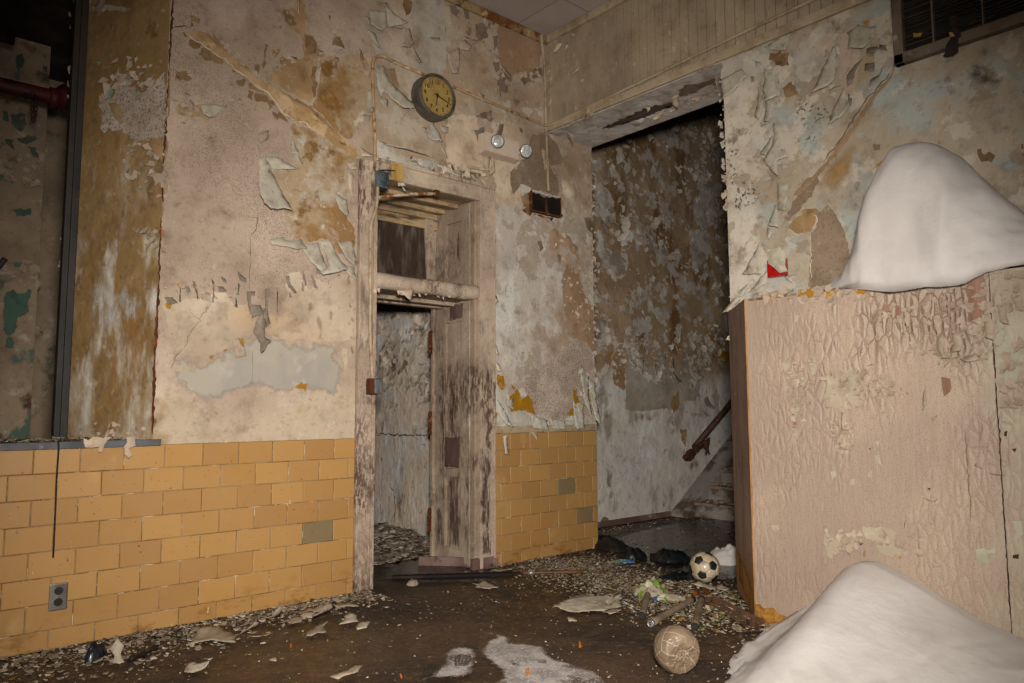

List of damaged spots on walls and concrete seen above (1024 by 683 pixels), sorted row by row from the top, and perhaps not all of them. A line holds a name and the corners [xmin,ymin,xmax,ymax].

peeling [0,111,41,187]
peeling [97,56,227,201]
peeling [0,259,41,348]
leakage [93,285,135,324]
peeling [162,0,1024,554]
crack [965,273,1019,633]
peeling [823,526,925,560]